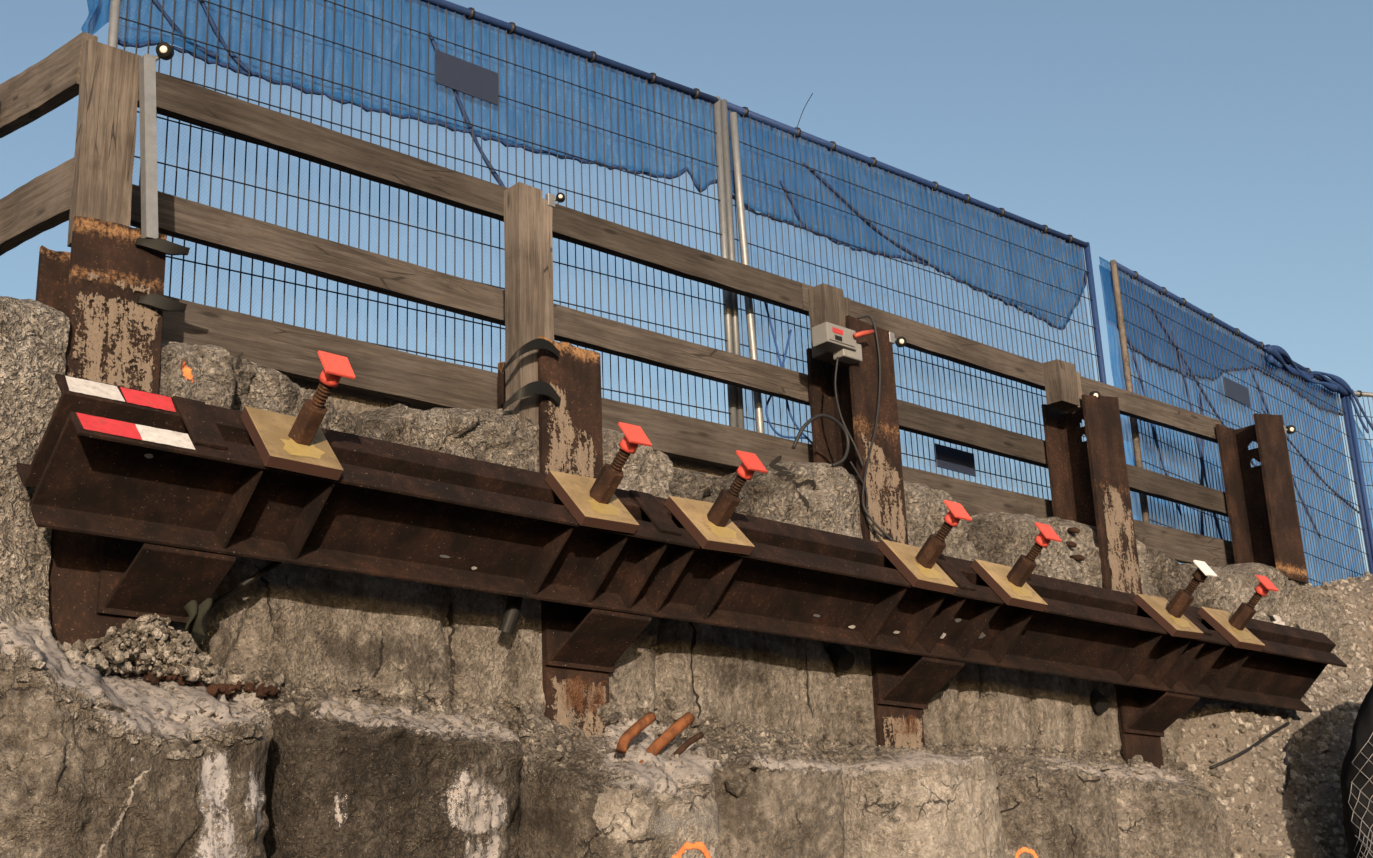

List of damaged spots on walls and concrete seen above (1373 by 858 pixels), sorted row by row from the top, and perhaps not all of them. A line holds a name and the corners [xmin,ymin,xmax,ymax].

crack [446,602,457,674]
spalling [0,617,274,807]
spalling [313,677,547,748]
efflorescence [195,752,264,858]
efflorescence [441,768,510,858]
spalling [551,676,1028,844]
spalling [1030,744,1192,787]